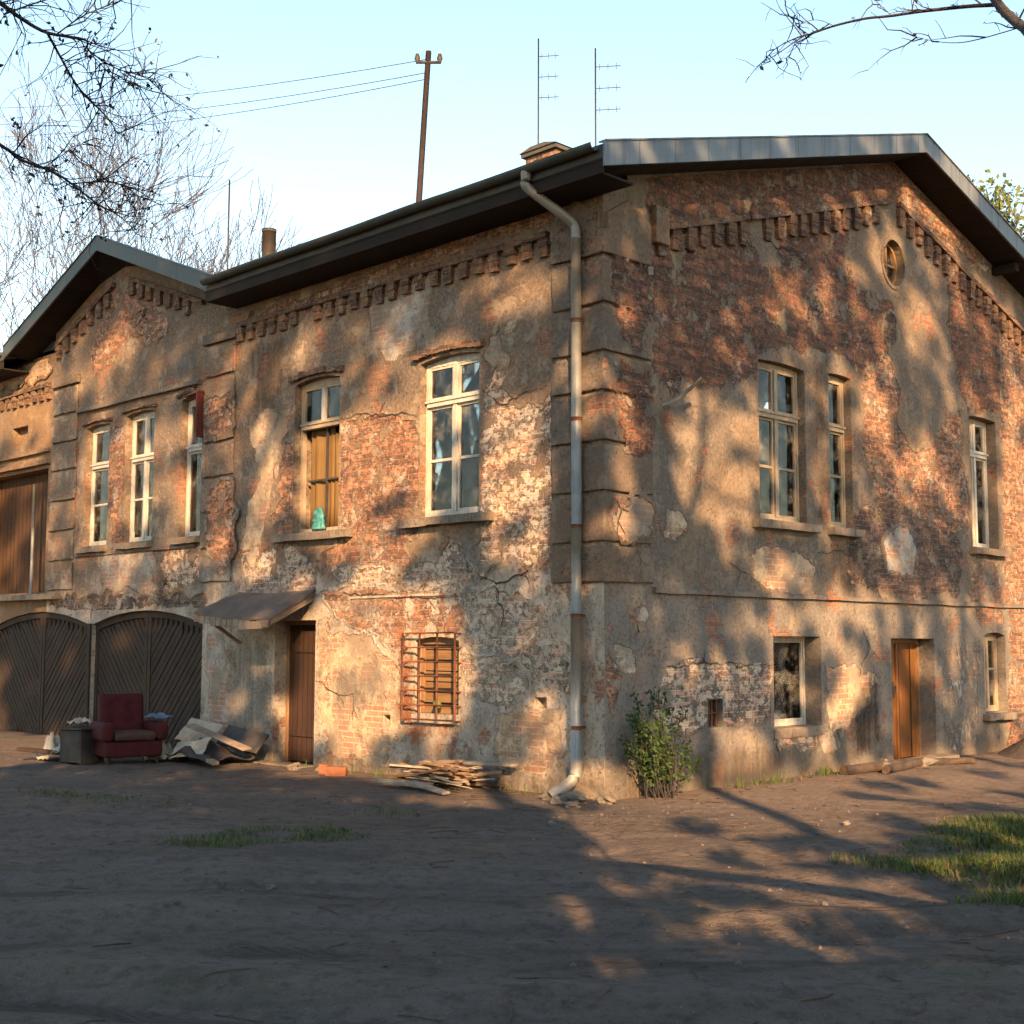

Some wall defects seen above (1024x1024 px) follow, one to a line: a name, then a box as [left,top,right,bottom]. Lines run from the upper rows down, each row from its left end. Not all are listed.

flaking render [50,310,571,781]
crack [479,540,553,628]
flaking render [606,164,1024,756]